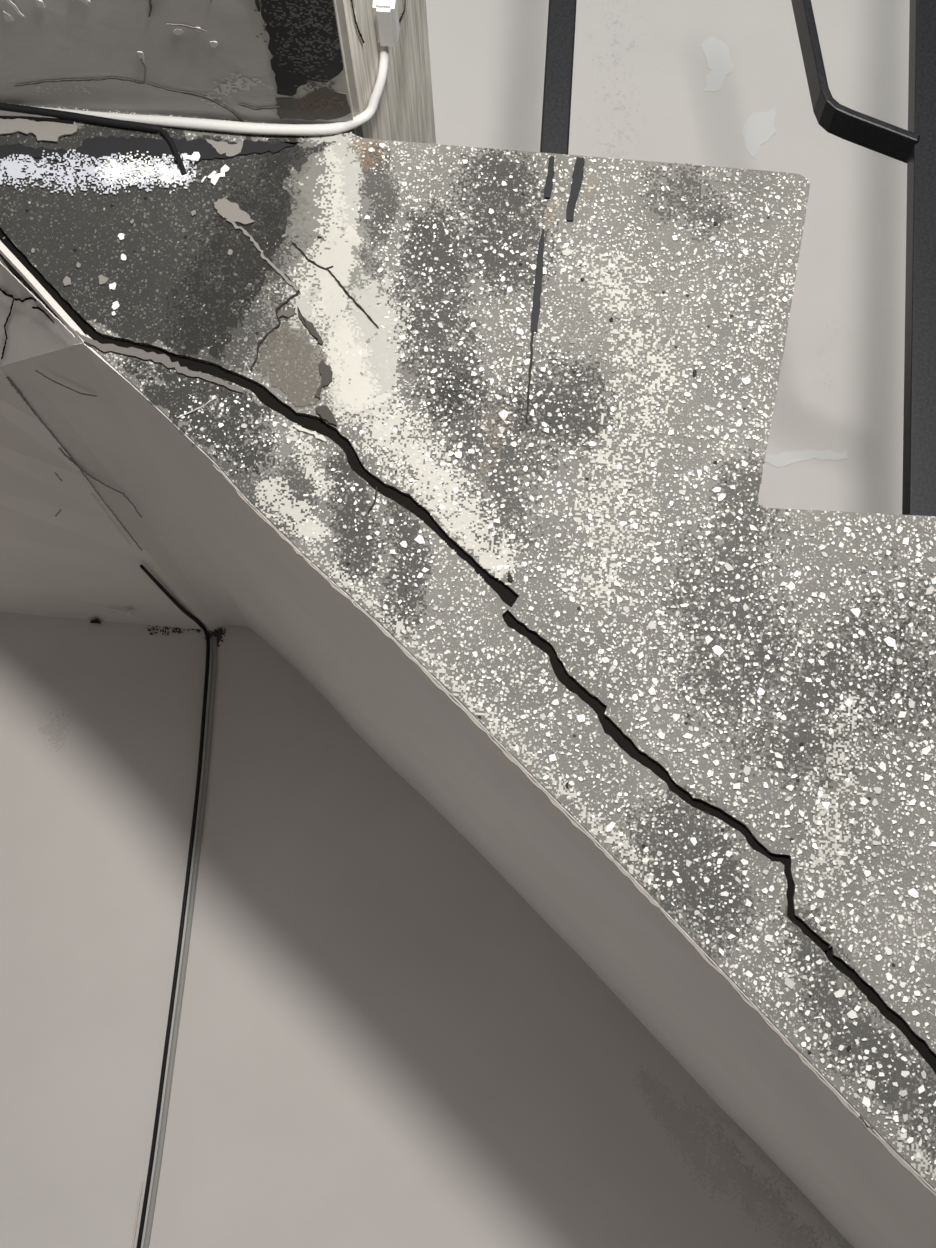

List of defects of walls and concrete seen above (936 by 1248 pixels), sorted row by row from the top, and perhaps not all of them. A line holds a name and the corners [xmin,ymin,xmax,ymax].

crack [6,0,24,17]
crack [148,0,212,32]
peeling [255,0,342,91]
crack [0,58,280,124]
peeling [206,139,246,167]
peeling [213,197,262,230]
crack [0,228,936,1197]
spalling [0,262,936,1180]